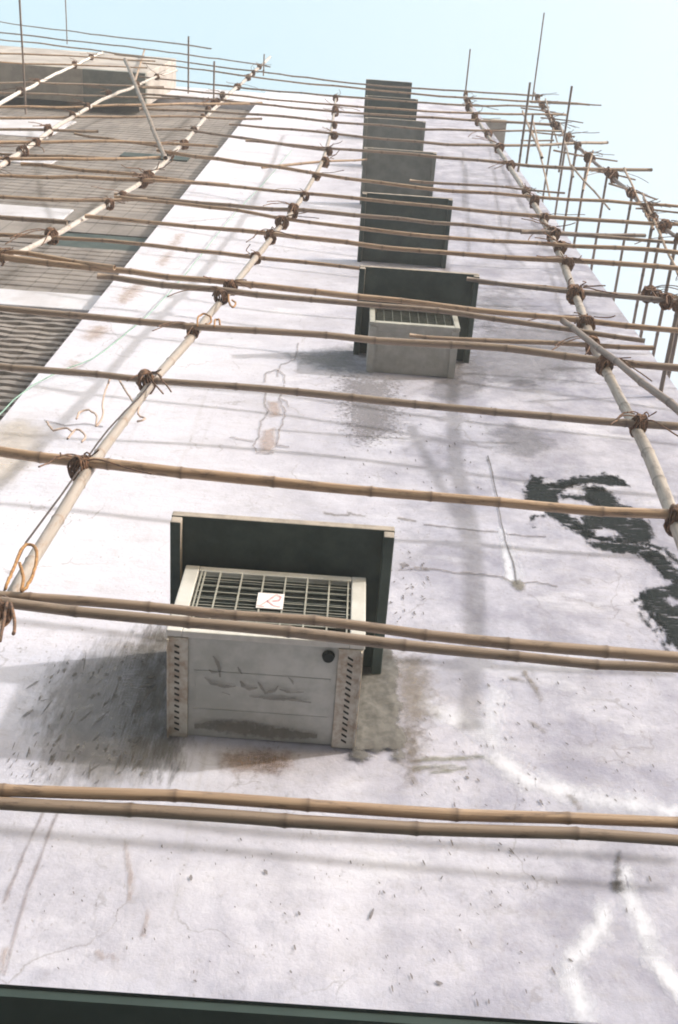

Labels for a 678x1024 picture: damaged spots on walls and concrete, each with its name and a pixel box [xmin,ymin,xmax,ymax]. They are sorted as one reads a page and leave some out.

damp [299,350,406,445]
crack [487,456,517,584]